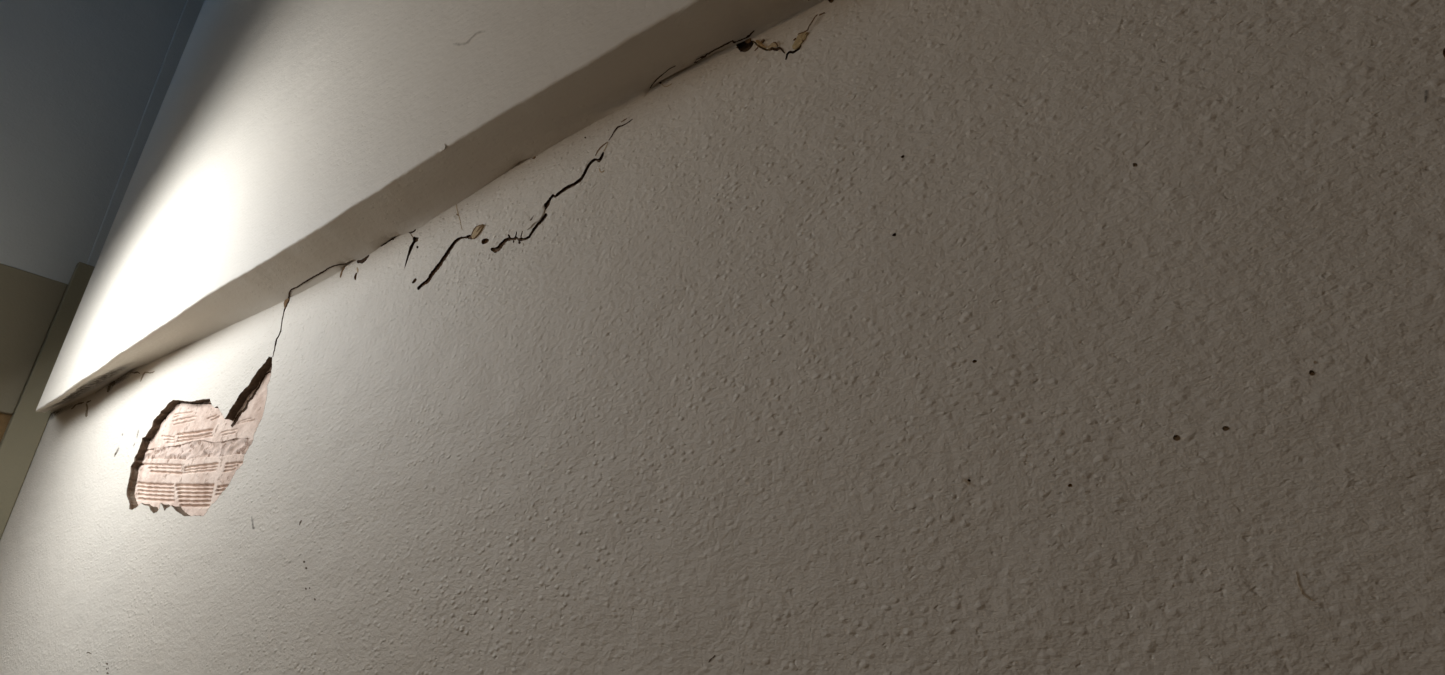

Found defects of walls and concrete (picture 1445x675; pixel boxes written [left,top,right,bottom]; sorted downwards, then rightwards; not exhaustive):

crack [650,12,825,88]
crack [273,119,633,356]
spalling [126,357,272,516]